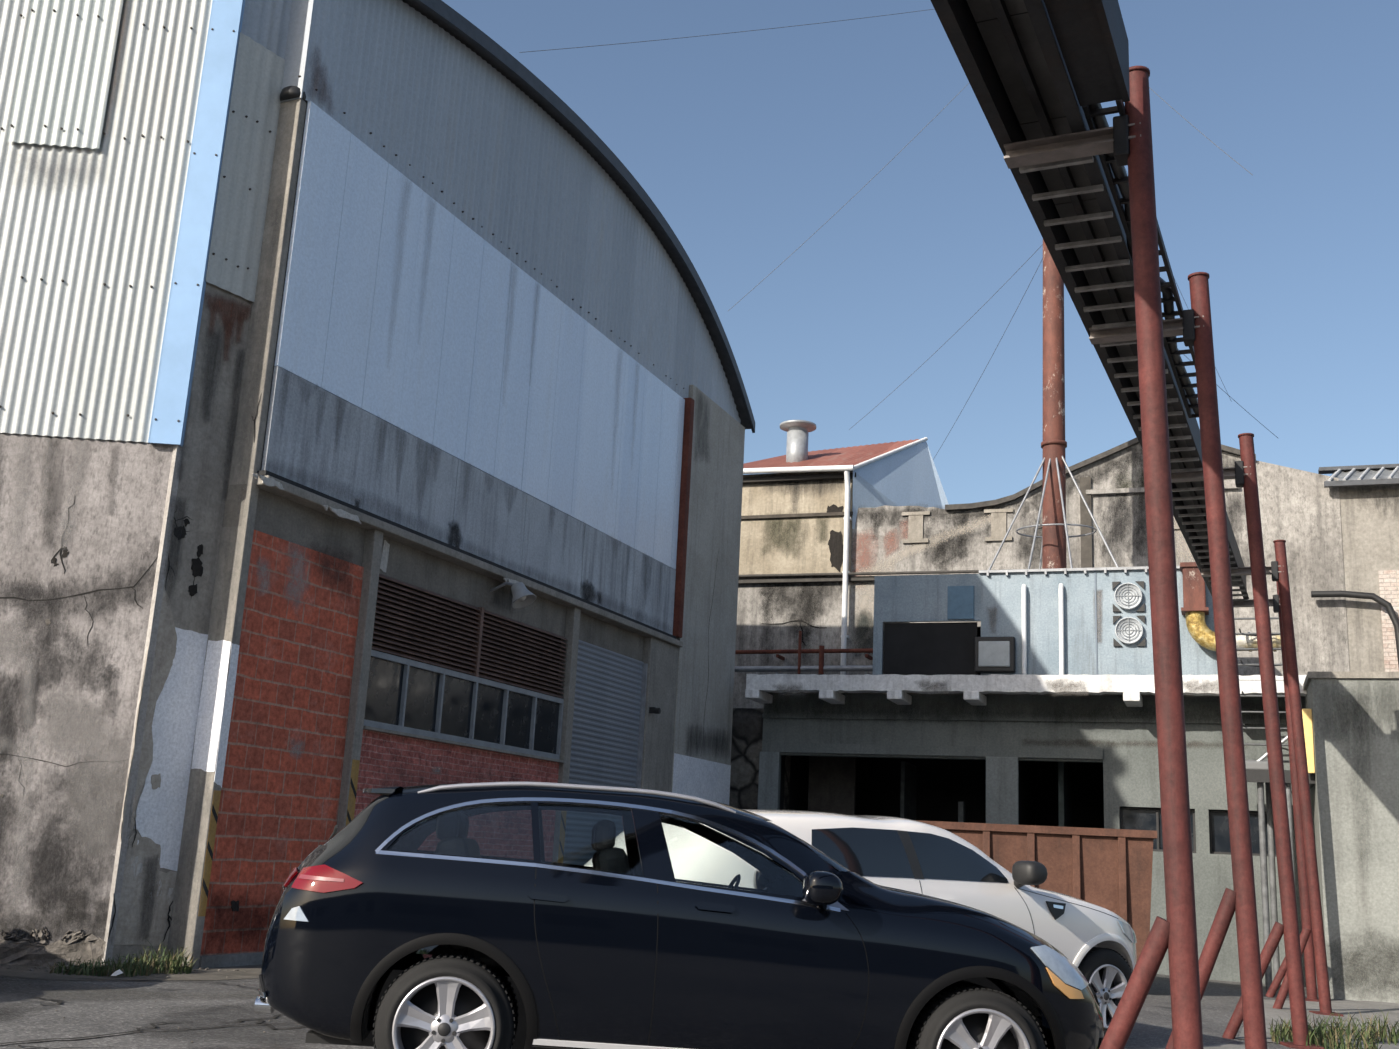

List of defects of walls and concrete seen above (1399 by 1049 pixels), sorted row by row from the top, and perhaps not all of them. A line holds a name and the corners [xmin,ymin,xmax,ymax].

leakage [0,504,185,759]
crack [0,496,195,644]
spalling [174,519,203,596]
leakage [764,576,841,661]
leakage [856,614,874,656]
leakage [857,492,1042,570]
leakage [1066,451,1147,551]
peeling [0,588,177,967]
leakage [0,764,122,942]